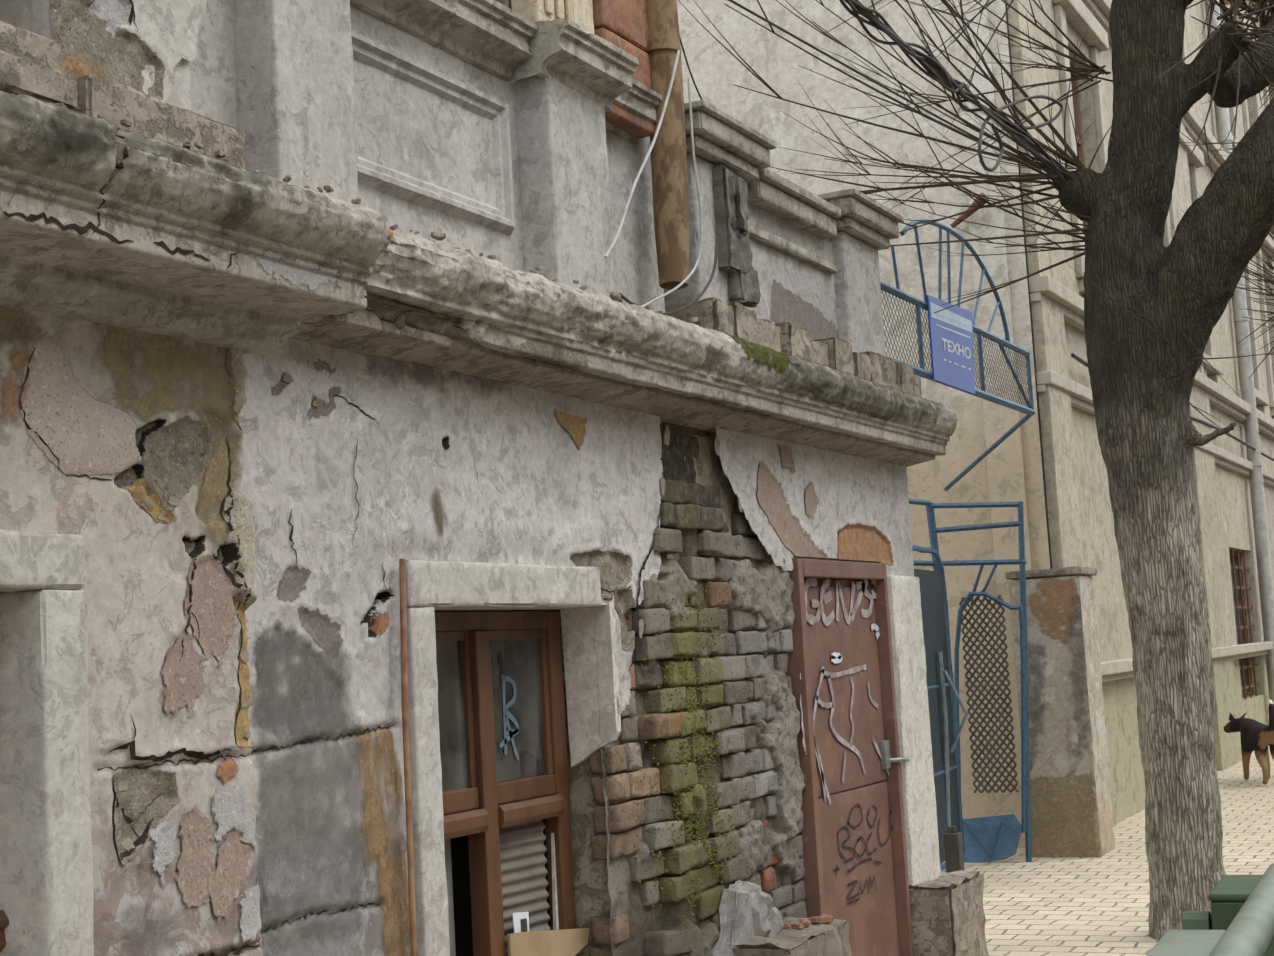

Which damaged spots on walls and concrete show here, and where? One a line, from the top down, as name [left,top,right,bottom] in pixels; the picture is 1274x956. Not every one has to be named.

spalling [49,0,165,101]
crack [4,135,240,268]
spalling [182,141,229,161]
spalling [281,175,334,193]
crack [18,347,64,474]
spalling [114,401,344,749]
spalling [361,565,394,637]
spalling [570,550,644,651]
crack [97,713,394,771]
peeling [113,764,262,943]